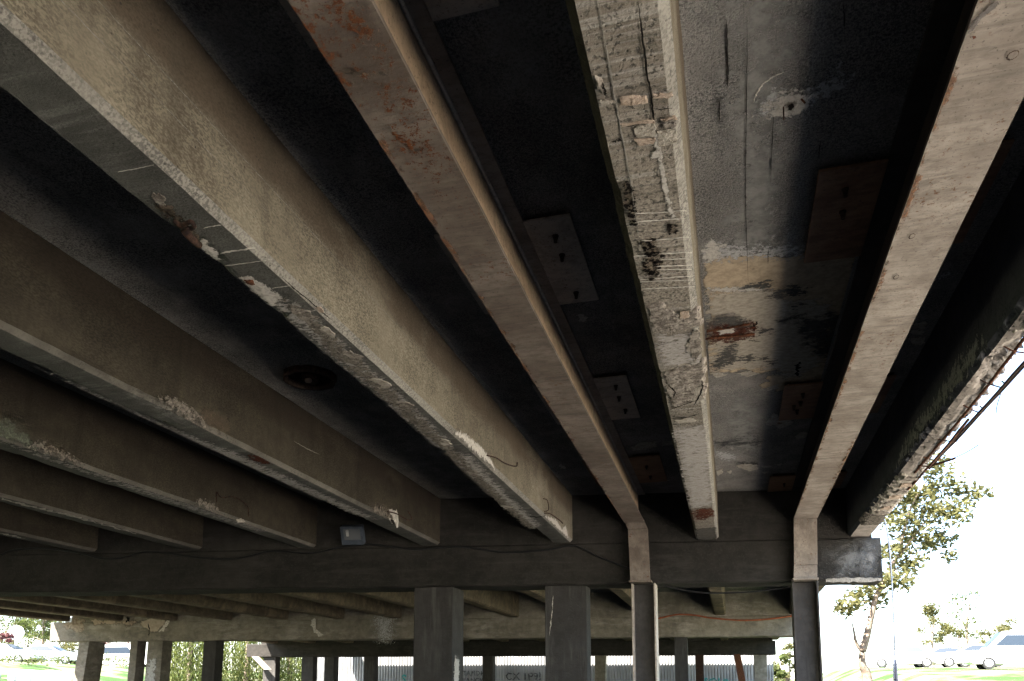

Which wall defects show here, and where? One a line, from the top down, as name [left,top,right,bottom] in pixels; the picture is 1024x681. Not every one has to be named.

corrosion [287,0,471,280]
spalling [595,75,673,106]
spalling [611,115,678,147]
crack [638,3,670,139]
crack [716,22,769,267]
spalling [151,192,255,261]
damp [640,239,839,358]
damp [47,371,399,528]
spalling [239,276,536,529]
damp [272,285,542,528]
corrosion [692,507,715,520]
spalling [858,321,1024,526]